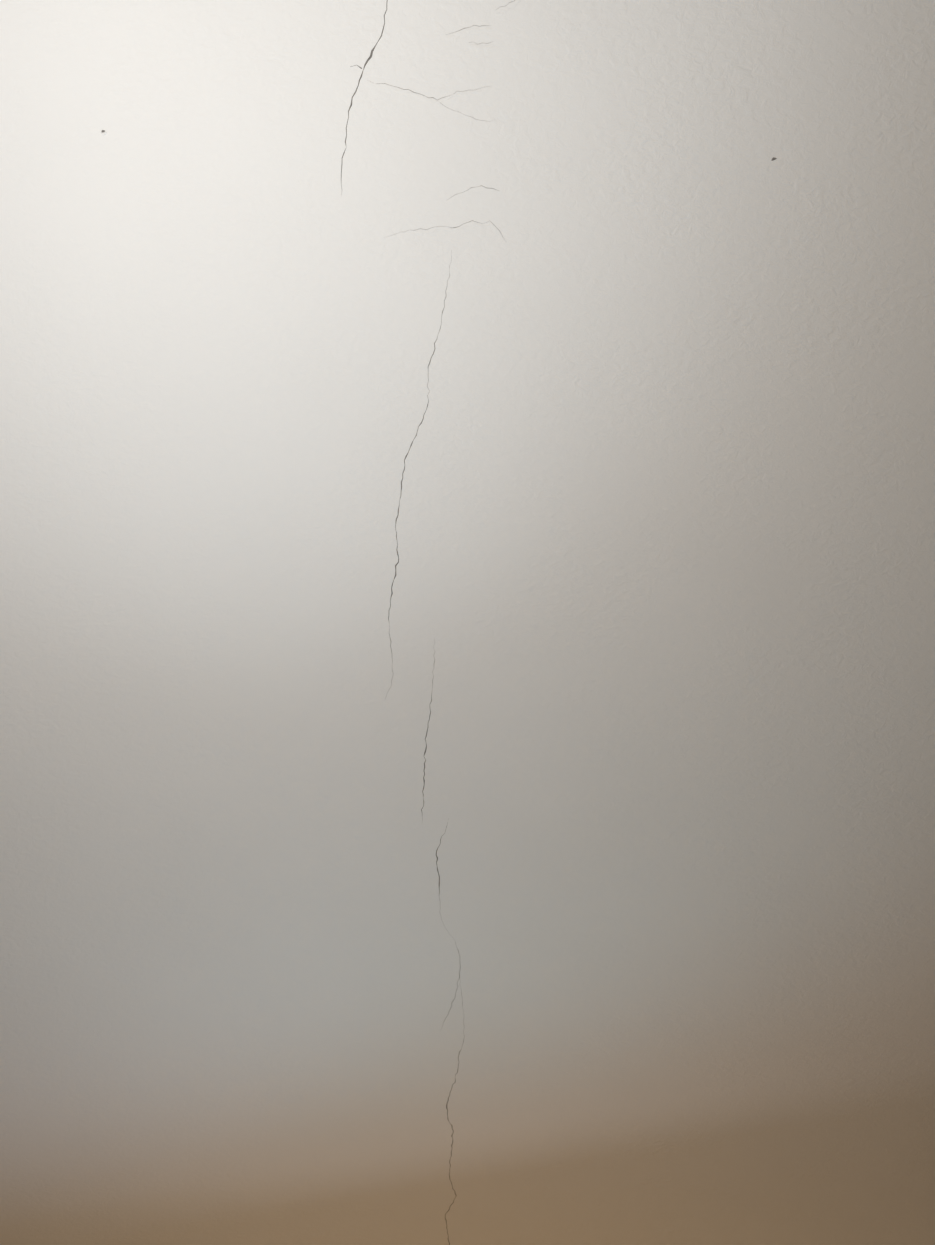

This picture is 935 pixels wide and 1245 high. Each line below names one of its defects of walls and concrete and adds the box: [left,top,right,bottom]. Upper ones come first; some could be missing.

crack [341,4,489,188]
crack [386,255,452,696]
crack [421,658,465,1245]